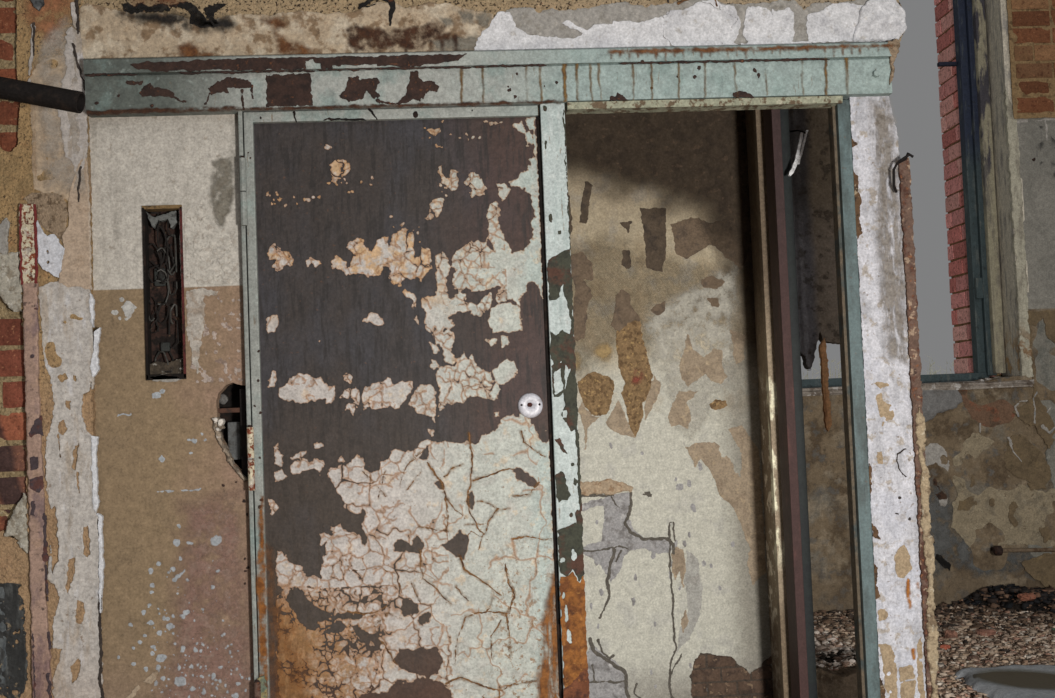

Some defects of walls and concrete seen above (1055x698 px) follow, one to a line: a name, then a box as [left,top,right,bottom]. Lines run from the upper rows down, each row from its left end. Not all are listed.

peeling [620,208,740,272]
spalling [853,171,863,239]
peeling [0,99,105,698]
corrosion [242,497,268,688]
peeling [117,106,713,698]
crack [347,433,552,698]
corrosion [538,572,590,698]
peeling [668,330,746,429]
peeling [685,425,767,585]
spalling [689,653,773,698]
peeling [878,637,925,698]
peeling [925,310,1055,588]